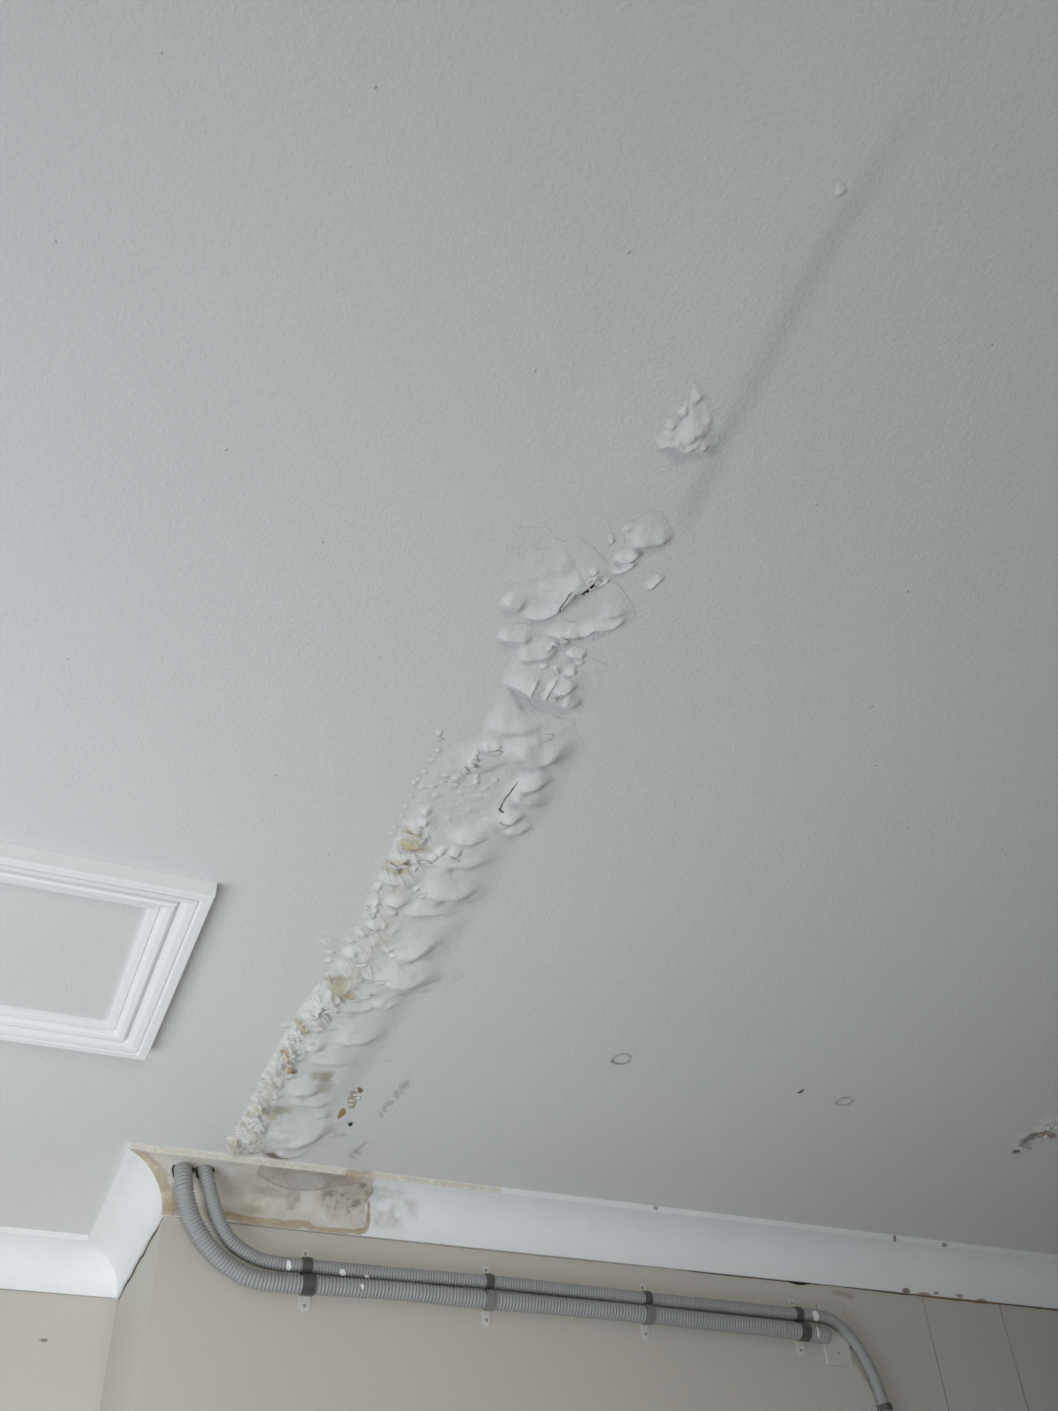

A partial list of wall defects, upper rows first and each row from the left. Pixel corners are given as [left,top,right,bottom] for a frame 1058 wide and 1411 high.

peeling [338,1088,363,1118]
peeling [1007,1112,1058,1157]
water stain [130,1142,501,1236]